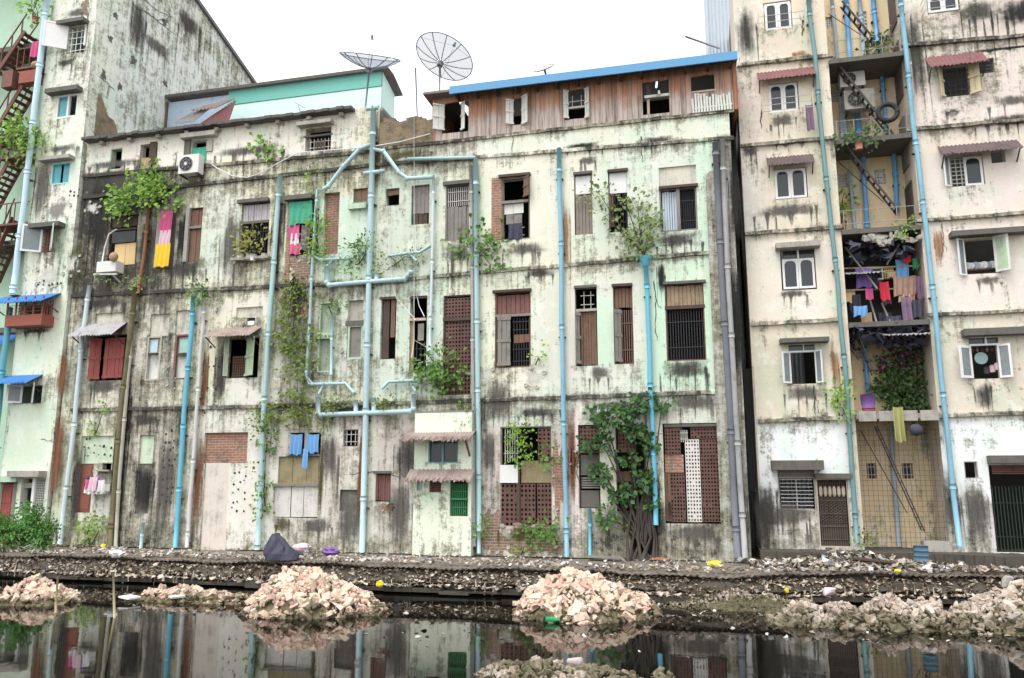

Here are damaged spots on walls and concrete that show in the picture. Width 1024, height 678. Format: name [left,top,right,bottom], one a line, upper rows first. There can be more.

leakage [131,1,202,66]
leakage [960,0,1024,55]
peeling [94,93,118,136]
leakage [567,143,603,171]
rust [933,233,943,260]
rust [53,355,67,397]
leakage [660,361,715,424]
rust [831,351,840,384]
rust [50,417,64,496]
leakage [90,381,175,525]
leakage [740,489,812,541]
leakage [943,478,990,535]